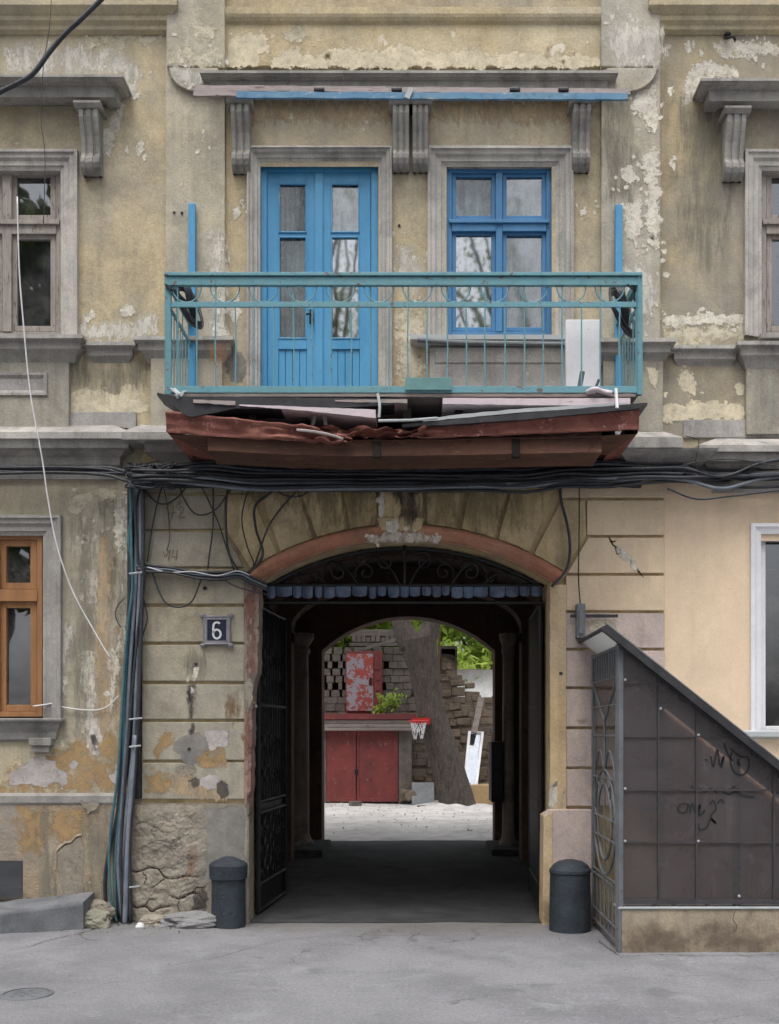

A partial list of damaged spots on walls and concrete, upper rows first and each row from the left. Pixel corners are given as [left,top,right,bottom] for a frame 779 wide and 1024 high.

peeling [77,13,779,345]
peeling [646,365,745,424]
peeling [365,492,441,547]
crack [608,537,644,578]
peeling [0,487,127,895]
peeling [145,587,257,801]
crack [132,819,206,912]